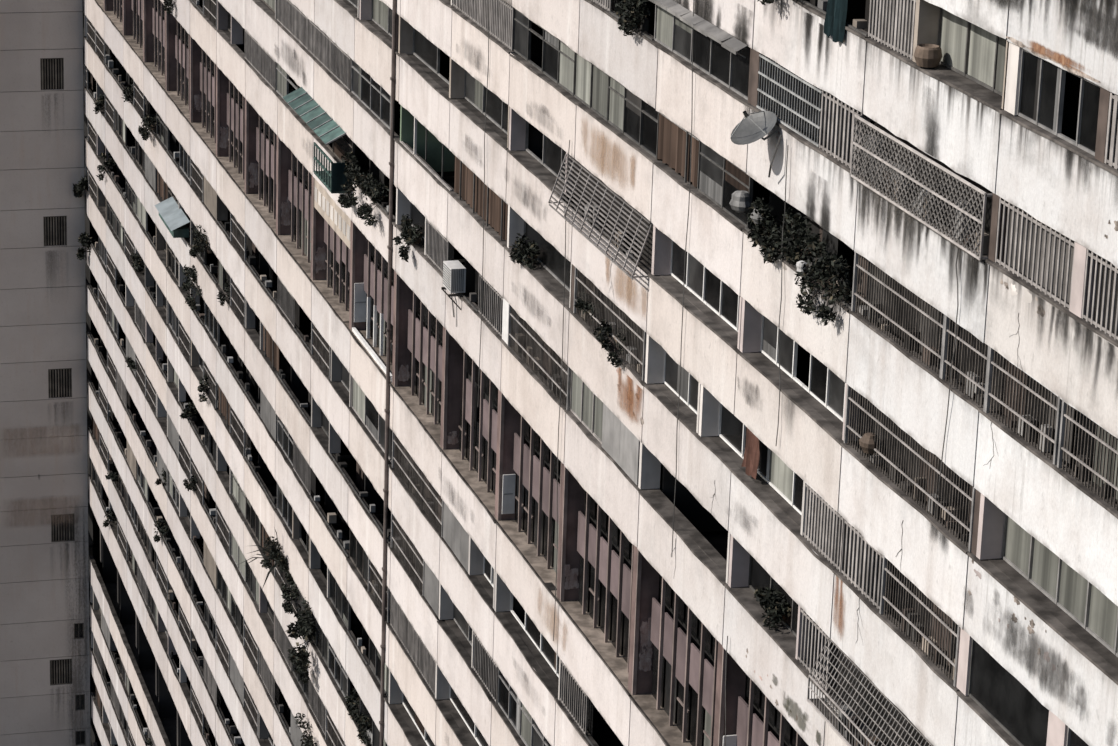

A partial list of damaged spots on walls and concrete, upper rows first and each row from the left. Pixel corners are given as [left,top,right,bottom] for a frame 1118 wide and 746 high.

water stain [673,0,720,28]
water stain [735,22,748,45]
water stain [1045,0,1118,57]
water stain [850,175,929,244]
water stain [942,237,987,292]
water stain [1039,298,1114,371]
corrosion [619,367,642,419]
water stain [1006,616,1072,696]